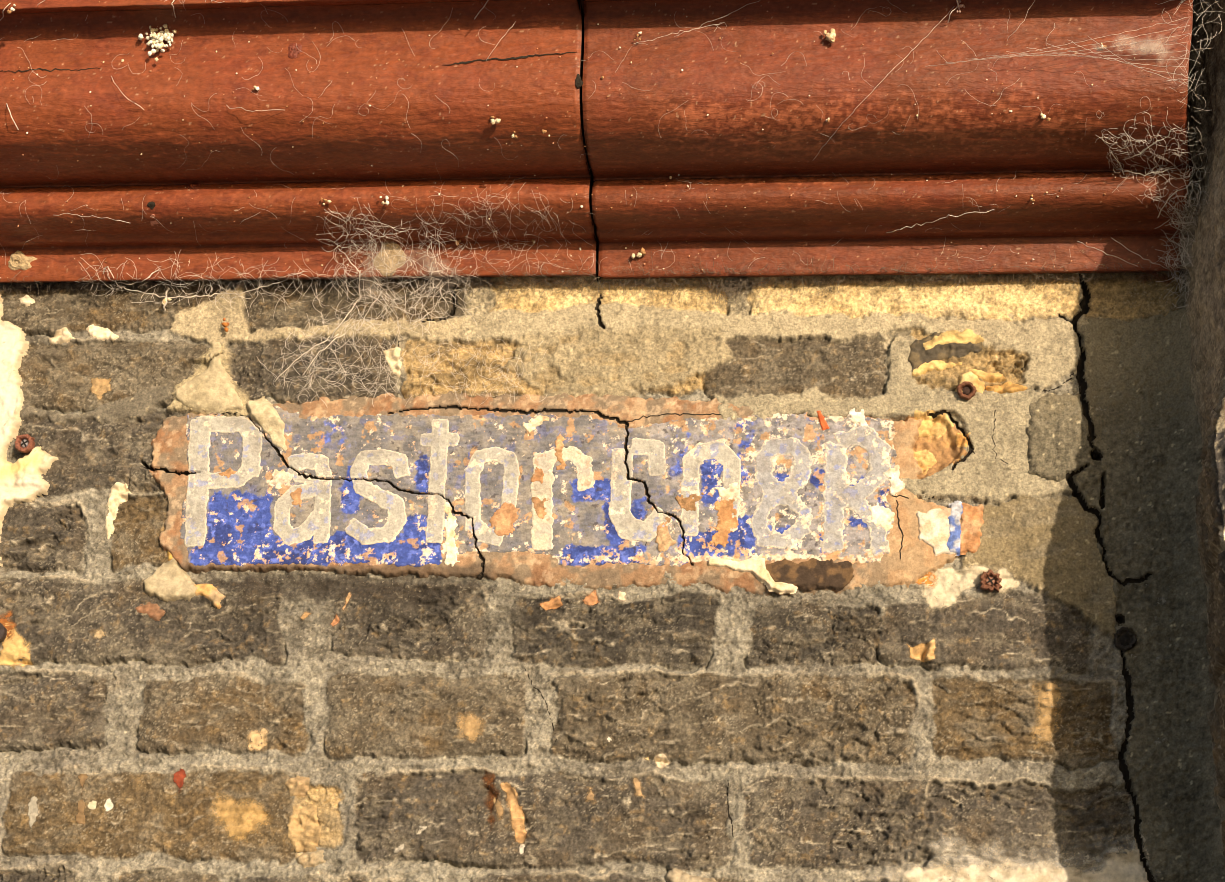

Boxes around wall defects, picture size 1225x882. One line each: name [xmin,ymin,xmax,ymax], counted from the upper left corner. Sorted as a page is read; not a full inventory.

crack [595,294,605,329]
crack [215,412,485,578]
peeling [441,502,460,567]
crack [388,405,721,566]
spalling [655,482,854,594]
spalling [863,409,970,532]
peeling [946,500,984,556]
rust [917,565,1020,608]
crack [1042,274,1152,586]
spalling [285,776,326,868]
spalling [493,782,527,844]
crack [1117,651,1156,882]